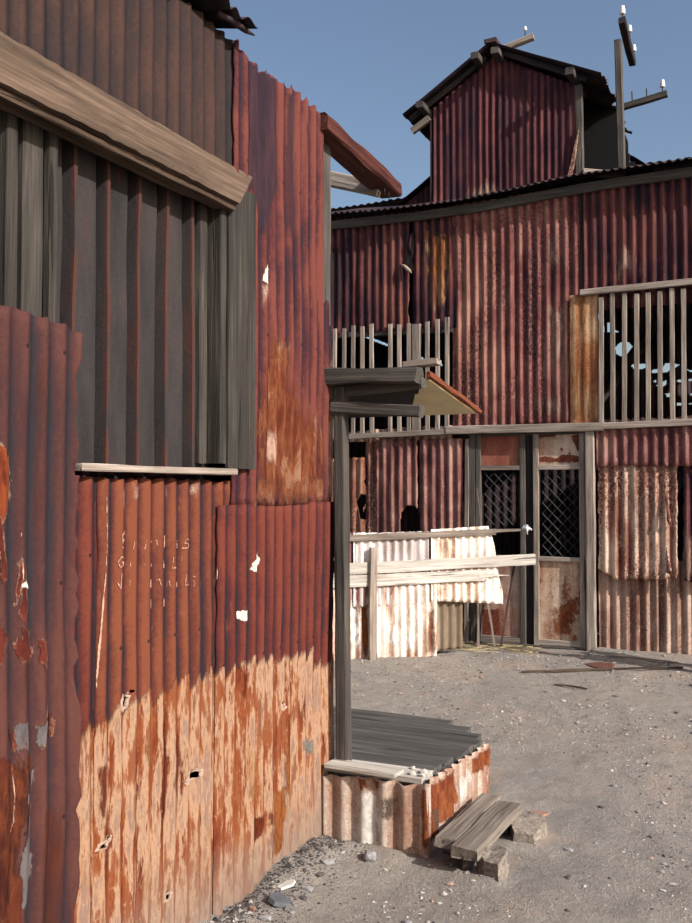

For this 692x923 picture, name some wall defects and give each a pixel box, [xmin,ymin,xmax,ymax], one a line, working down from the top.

corrosion [423,231,450,309]
corrosion [255,335,333,505]
spalling [236,610,247,622]
corrosion [428,610,436,651]
corrosion [554,577,580,640]
corrosion [0,754,35,923]
corrosion [74,646,334,923]
corrosion [421,770,458,848]
corrosion [472,748,490,773]